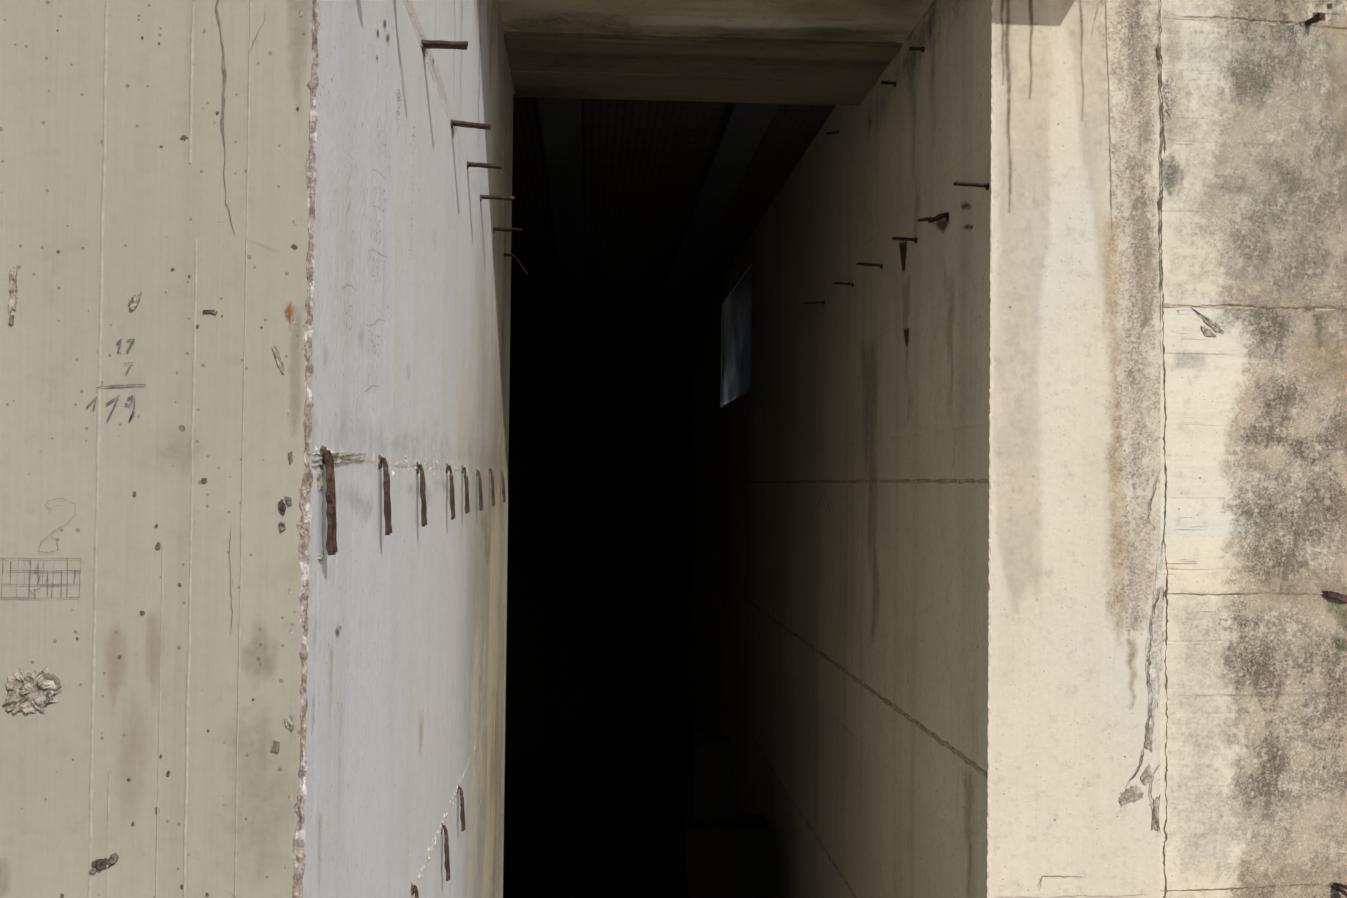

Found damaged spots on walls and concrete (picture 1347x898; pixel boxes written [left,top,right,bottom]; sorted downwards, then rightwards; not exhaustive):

crack [186,0,281,252]
damp [1001,0,1010,131]
damp [1108,0,1183,630]
crack [995,0,1347,898]
damp [1203,0,1347,898]